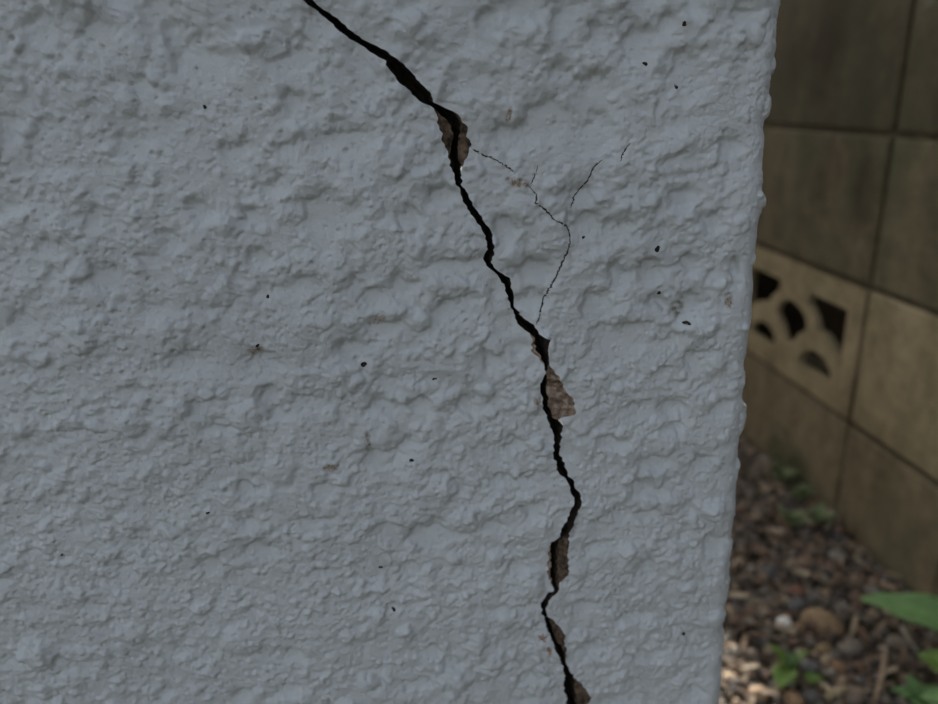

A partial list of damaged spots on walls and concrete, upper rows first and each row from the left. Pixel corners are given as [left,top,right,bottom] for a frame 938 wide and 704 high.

crack [304,0,630,704]